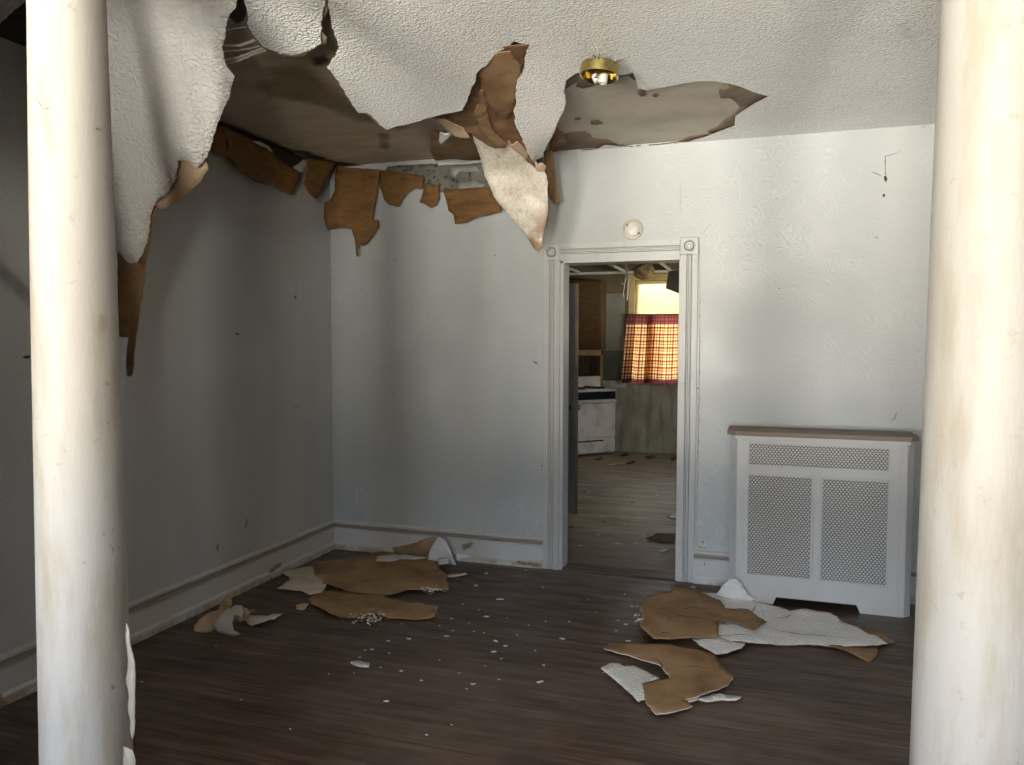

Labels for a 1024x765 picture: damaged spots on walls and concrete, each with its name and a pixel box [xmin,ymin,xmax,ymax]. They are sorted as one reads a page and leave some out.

flaking render [210,8,501,257]
peeling [545,73,766,151]
crack [871,152,898,197]